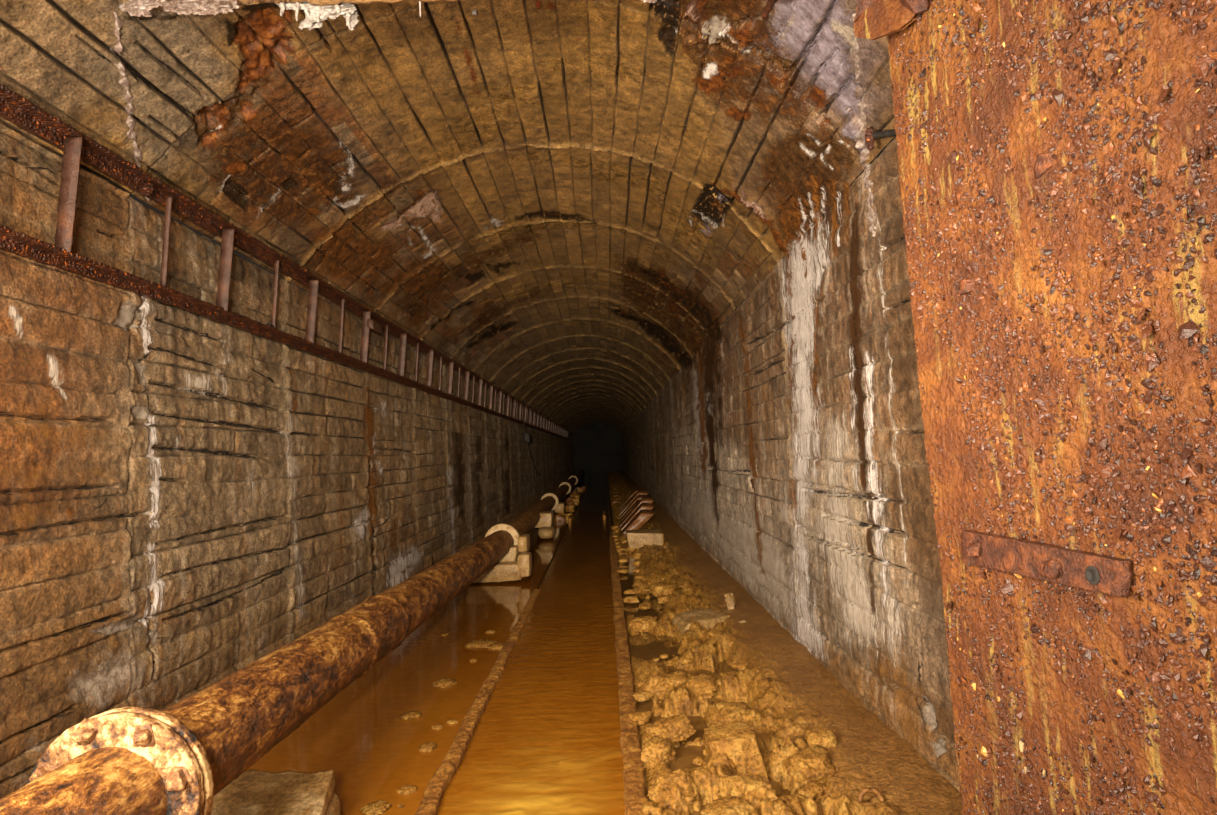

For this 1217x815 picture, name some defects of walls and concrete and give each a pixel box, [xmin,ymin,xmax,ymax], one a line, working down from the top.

spalling [118,0,296,145]
rust [194,101,360,229]
rust [398,209,595,328]
water stain [181,346,230,397]
water stain [608,132,905,665]
water stain [145,415,163,528]
rust [362,383,398,567]